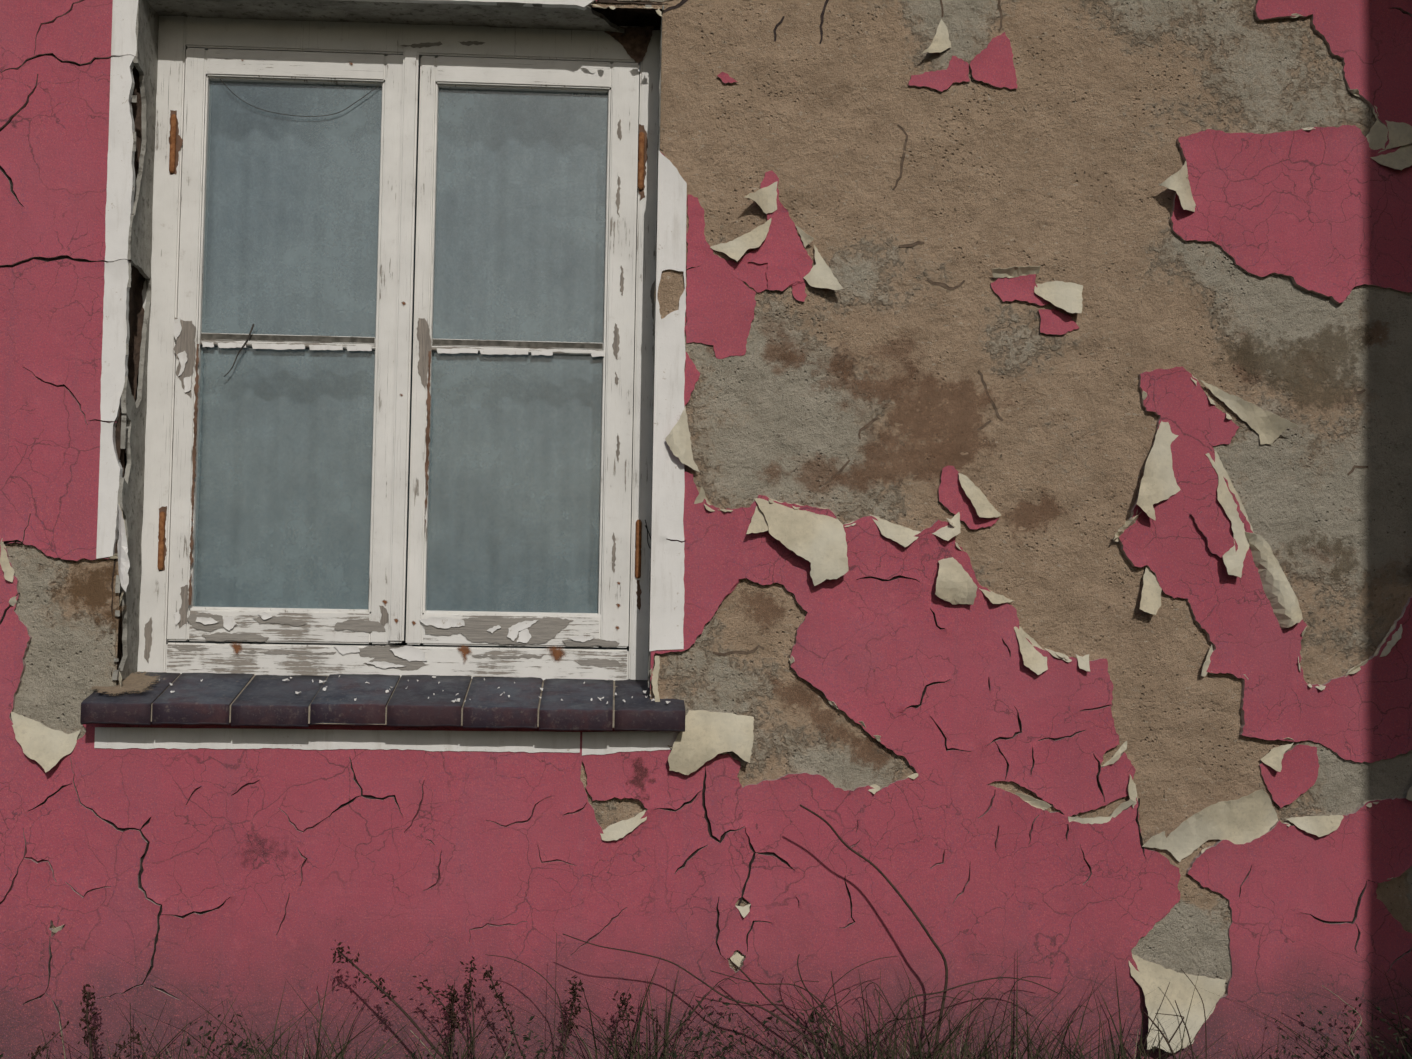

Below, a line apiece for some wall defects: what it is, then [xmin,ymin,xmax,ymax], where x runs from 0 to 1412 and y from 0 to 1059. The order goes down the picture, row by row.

crack [0,0,117,132]
crack [0,256,131,268]
peeling [158,506,167,571]
peeling [172,317,622,671]
peeling [591,0,1412,1053]
peeling [0,504,130,773]
peeling [144,618,153,663]
crack [0,775,230,999]
crack [276,759,442,936]
peeling [580,762,647,841]
crack [657,764,799,959]
crack [907,639,1113,904]